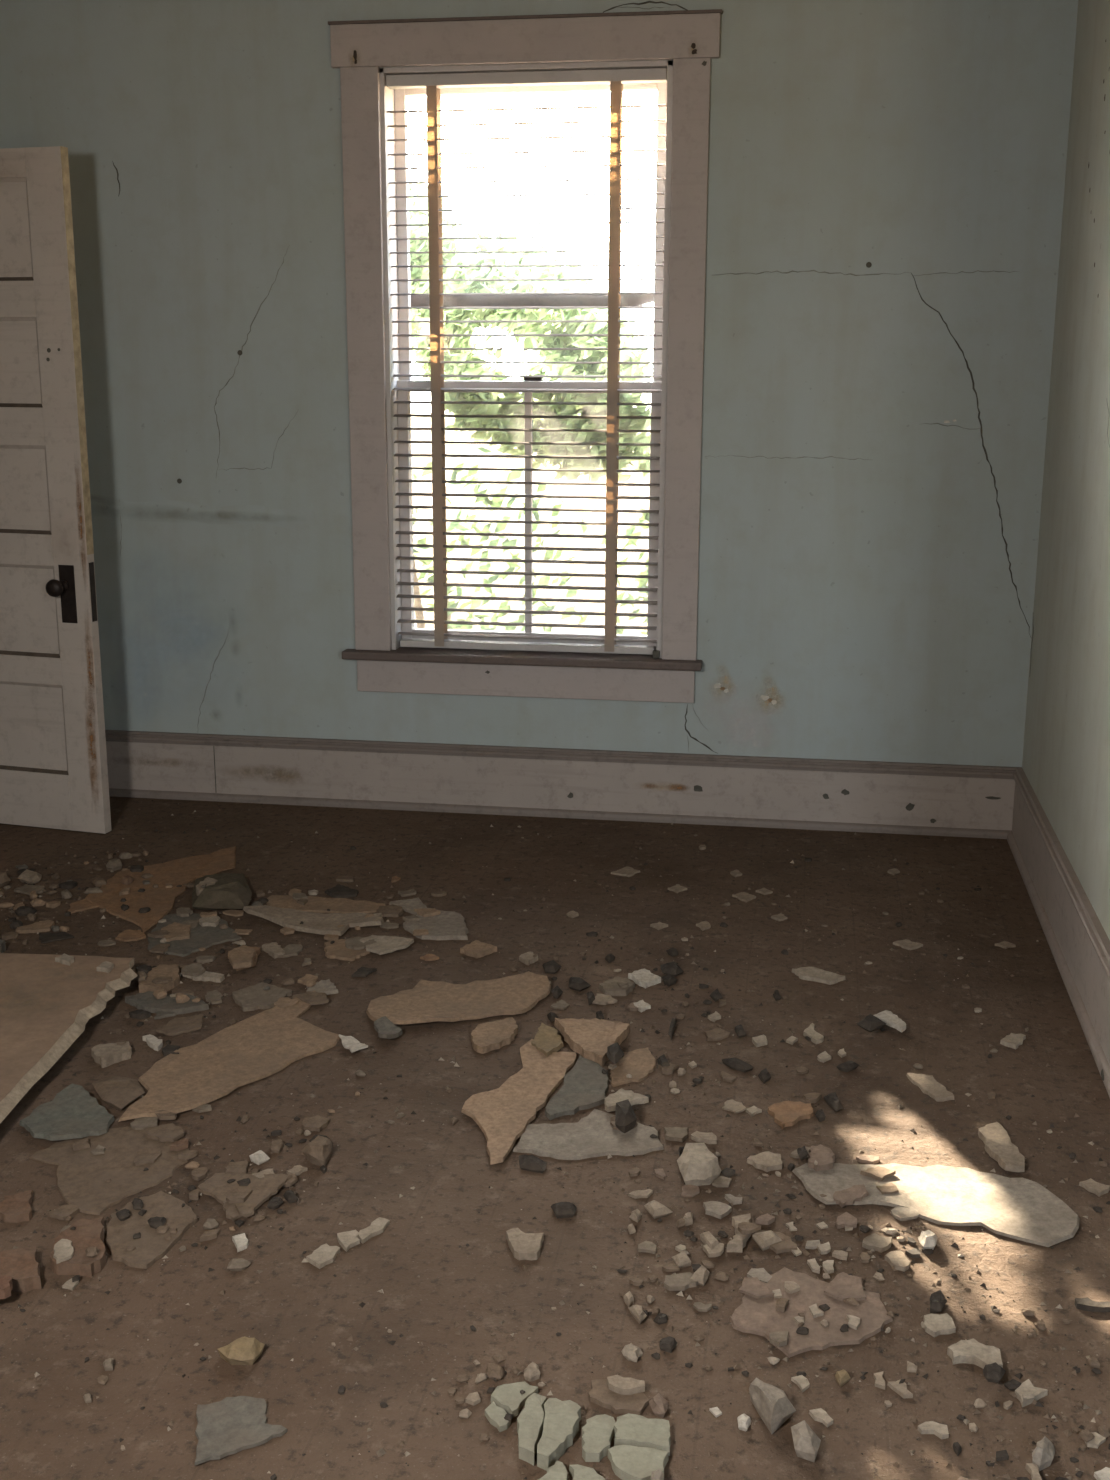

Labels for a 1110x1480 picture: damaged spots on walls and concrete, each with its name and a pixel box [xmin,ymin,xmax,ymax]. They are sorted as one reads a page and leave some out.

crack [706,270,1034,670]